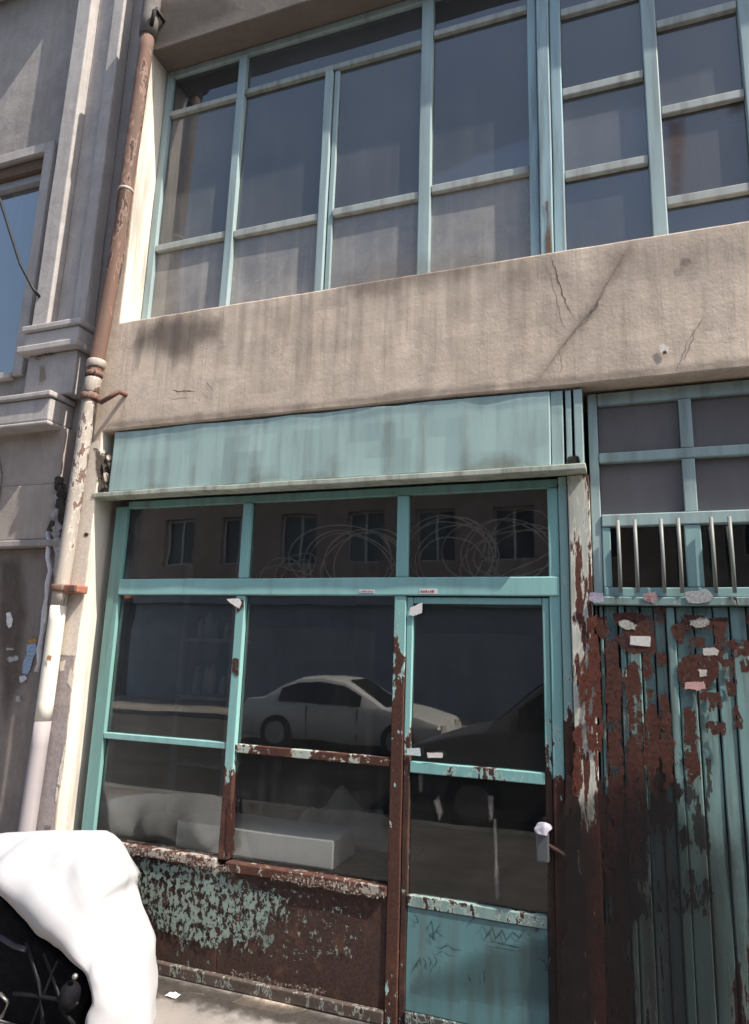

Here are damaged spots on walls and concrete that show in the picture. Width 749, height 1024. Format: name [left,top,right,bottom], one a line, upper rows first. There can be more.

leakage [148,321,213,349]
crack [537,245,630,380]
crack [683,318,703,361]
peeling [36,440,112,831]